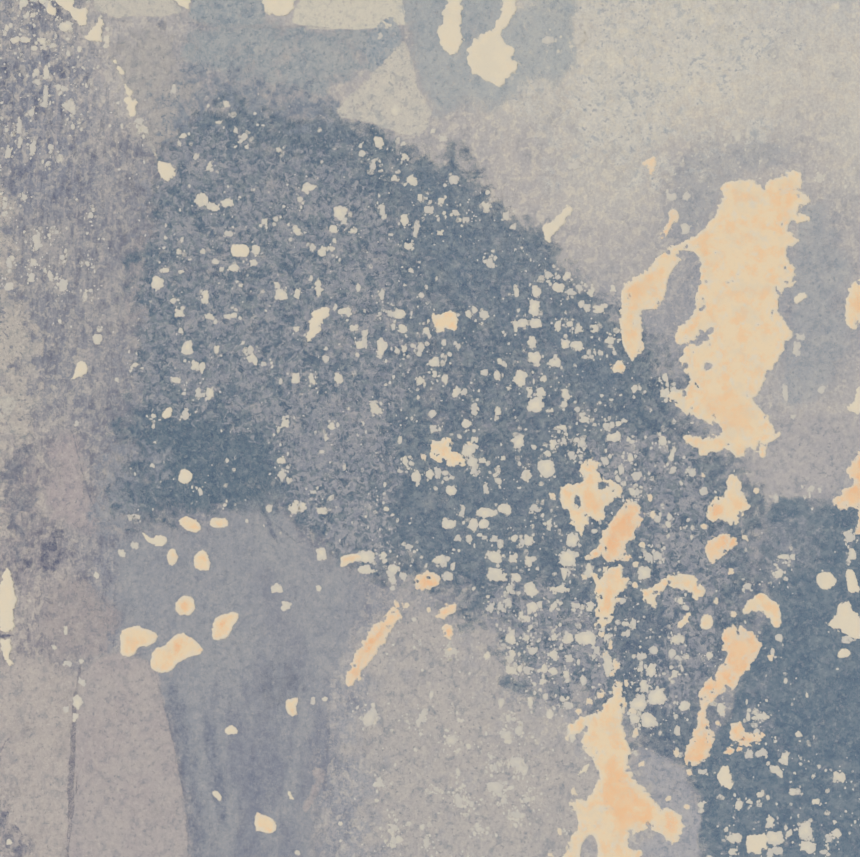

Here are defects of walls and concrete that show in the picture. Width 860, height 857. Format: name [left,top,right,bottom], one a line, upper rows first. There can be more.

peeling [436,0,518,87]
peeling [155,154,176,189]
peeling [149,184,302,324]
peeling [259,174,362,262]
peeling [146,291,222,428]
peeling [173,464,213,504]
peeling [178,499,246,533]
peeling [288,133,860,857]
peeling [0,568,17,666]
peeling [120,625,203,673]
peeling [211,612,238,641]
peeling [254,812,277,833]